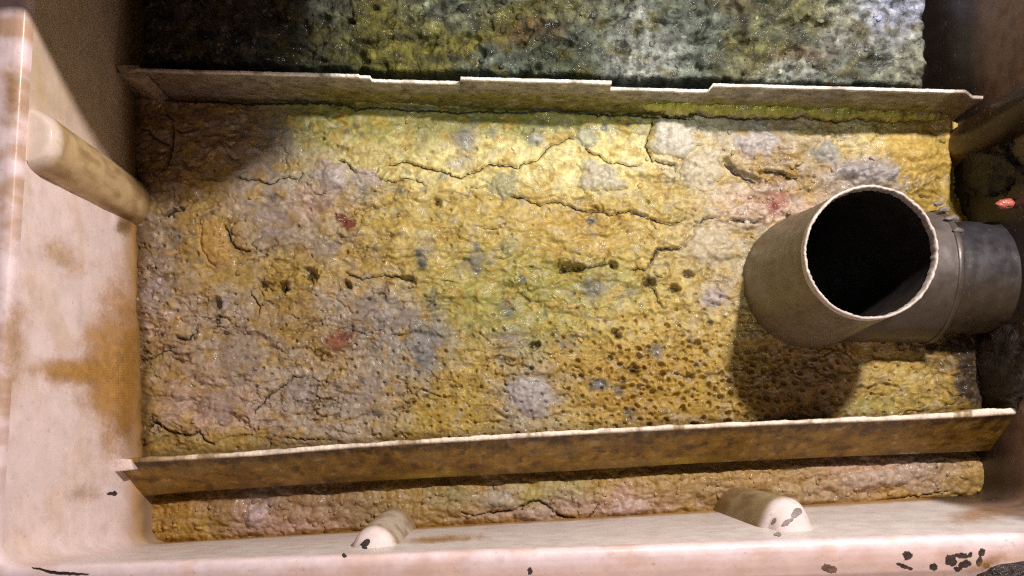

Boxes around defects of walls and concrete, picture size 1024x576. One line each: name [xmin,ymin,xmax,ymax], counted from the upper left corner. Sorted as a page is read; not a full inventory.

crack [379,121,676,189]
crack [724,164,798,184]
crack [510,196,762,309]
crack [346,272,403,281]
crack [255,376,303,412]
crack [150,422,213,444]